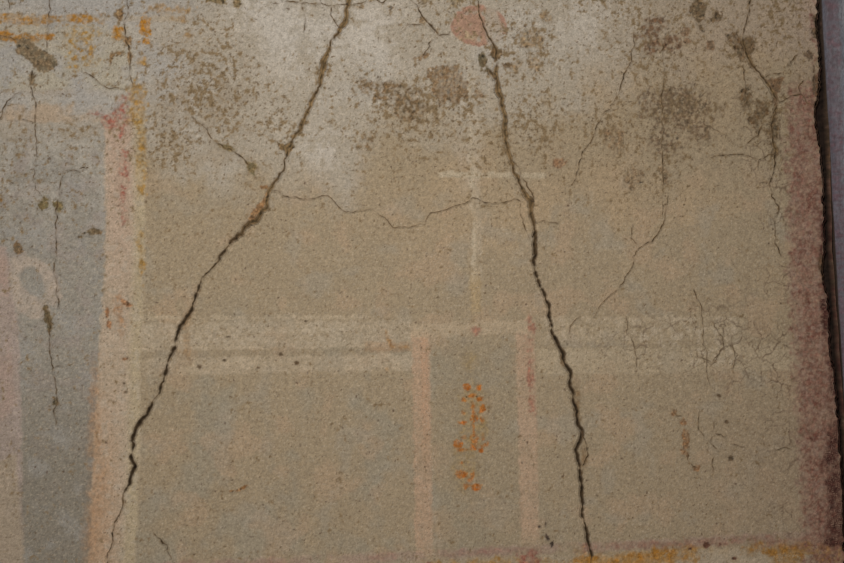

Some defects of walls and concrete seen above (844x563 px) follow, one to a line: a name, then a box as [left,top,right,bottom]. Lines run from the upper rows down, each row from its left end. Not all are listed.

crack [44,0,52,50]
crack [83,0,135,91]
crack [0,69,89,427]
crack [106,0,669,563]
crack [702,0,844,549]
crack [691,287,736,384]
crack [672,409,745,474]